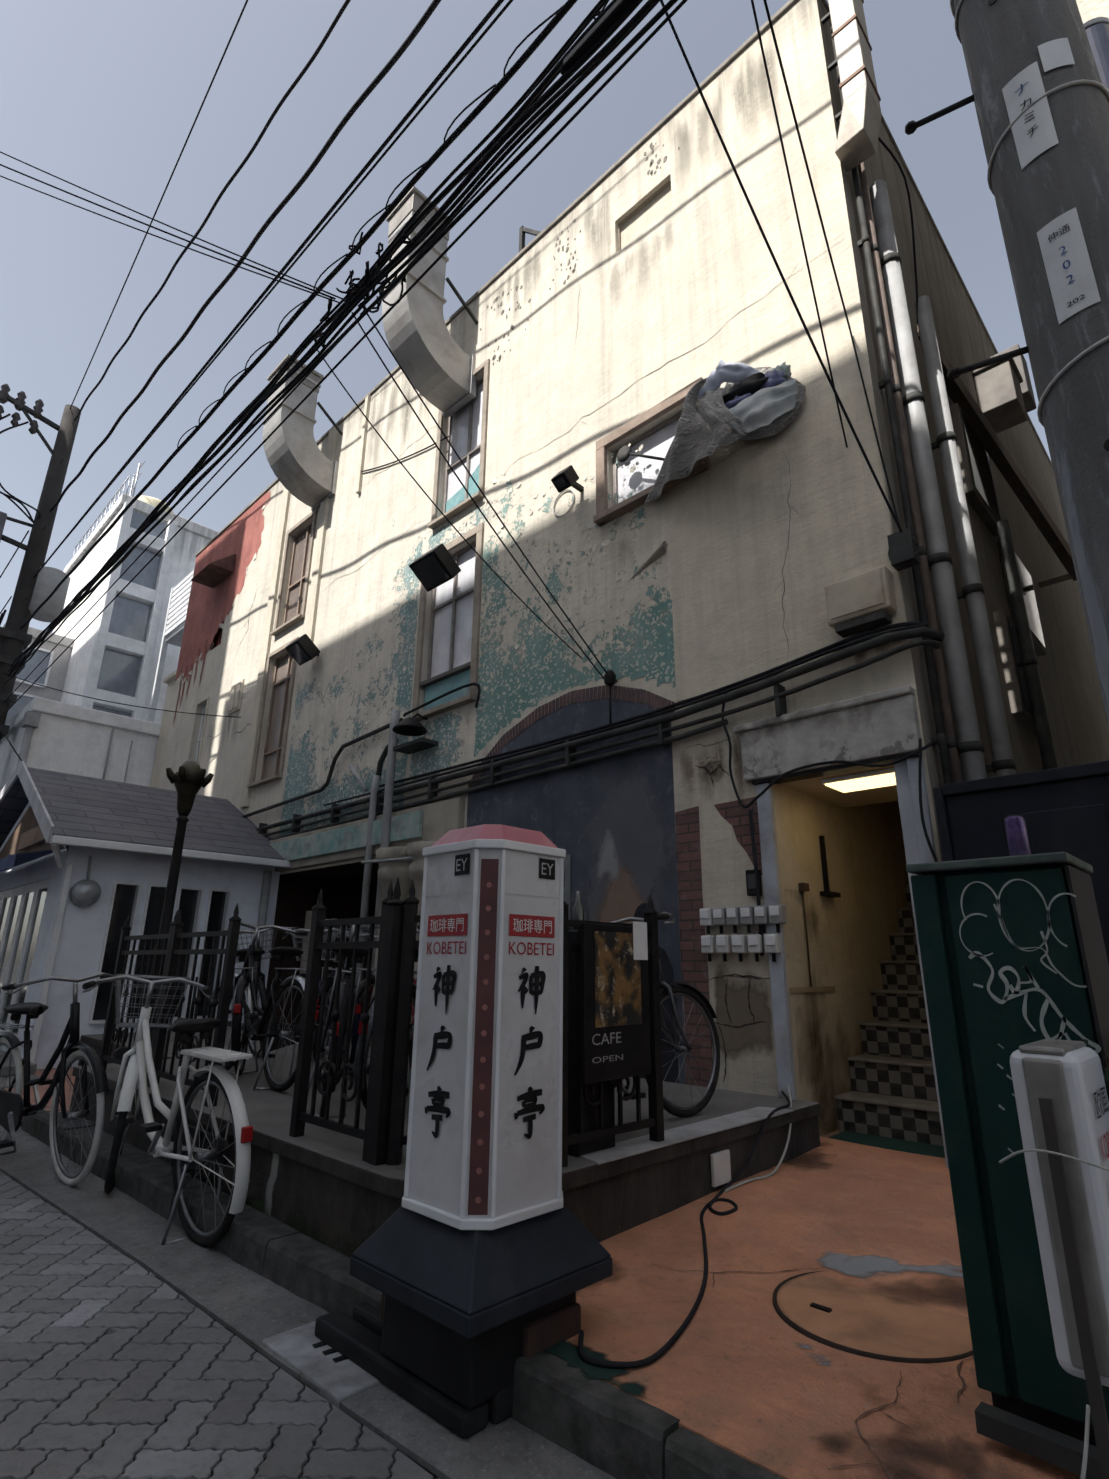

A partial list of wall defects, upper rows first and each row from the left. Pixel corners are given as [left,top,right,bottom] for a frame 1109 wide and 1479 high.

peeling [174,491,271,722]
peeling [279,443,676,837]
crack [774,450,798,658]
crack [829,1371,910,1479]
crack [956,1356,974,1403]